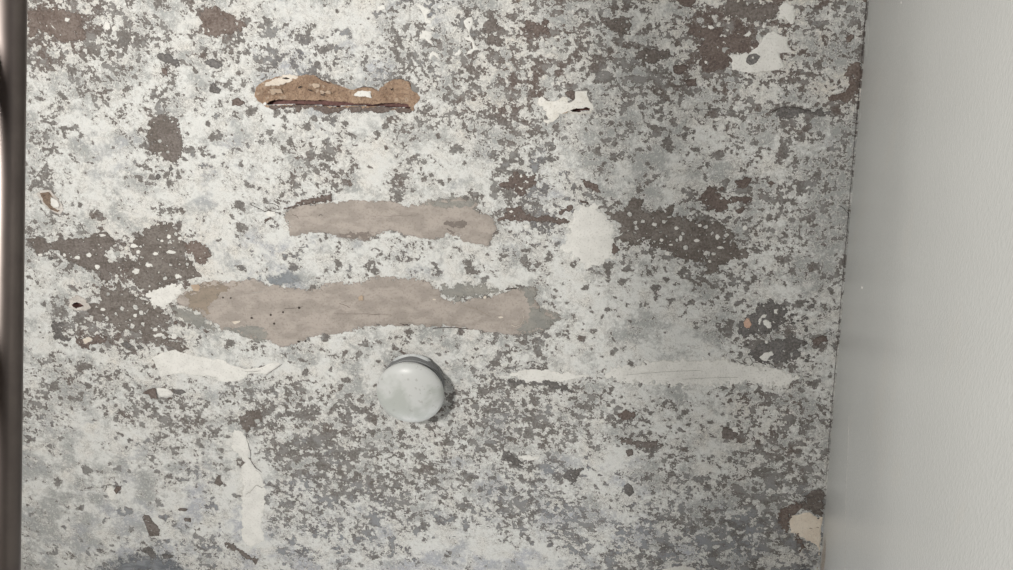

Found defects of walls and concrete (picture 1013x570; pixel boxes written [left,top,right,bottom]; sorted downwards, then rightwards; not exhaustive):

peeling [197,5,247,39]
peeling [155,53,180,77]
peeling [204,50,223,69]
flaking render [255,74,420,114]
flaking render [778,486,826,555]